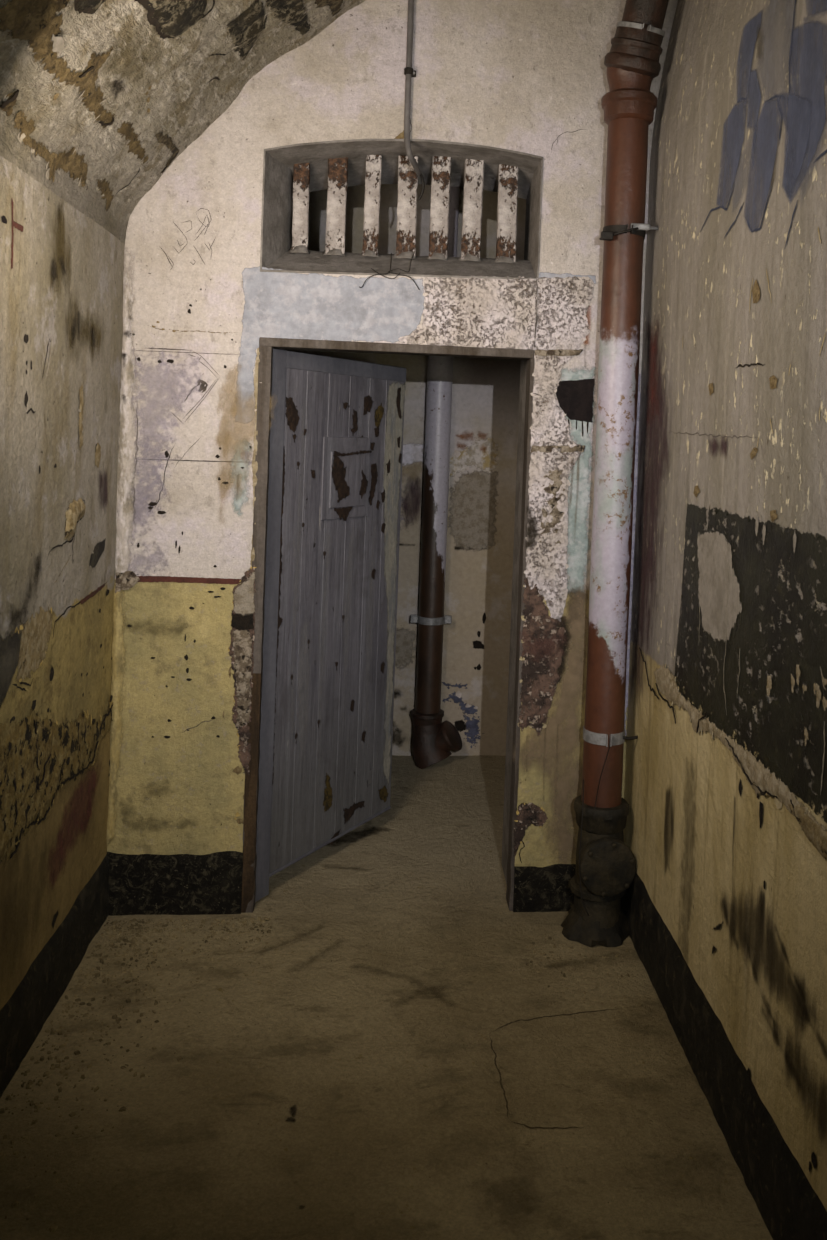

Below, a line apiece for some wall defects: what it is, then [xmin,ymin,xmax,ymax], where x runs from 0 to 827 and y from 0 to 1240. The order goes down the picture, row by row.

spalling [0,693,113,864]
spalling [208,348,261,775]
peeling [398,272,596,736]
peeling [671,486,827,860]
crack [489,1008,621,1129]